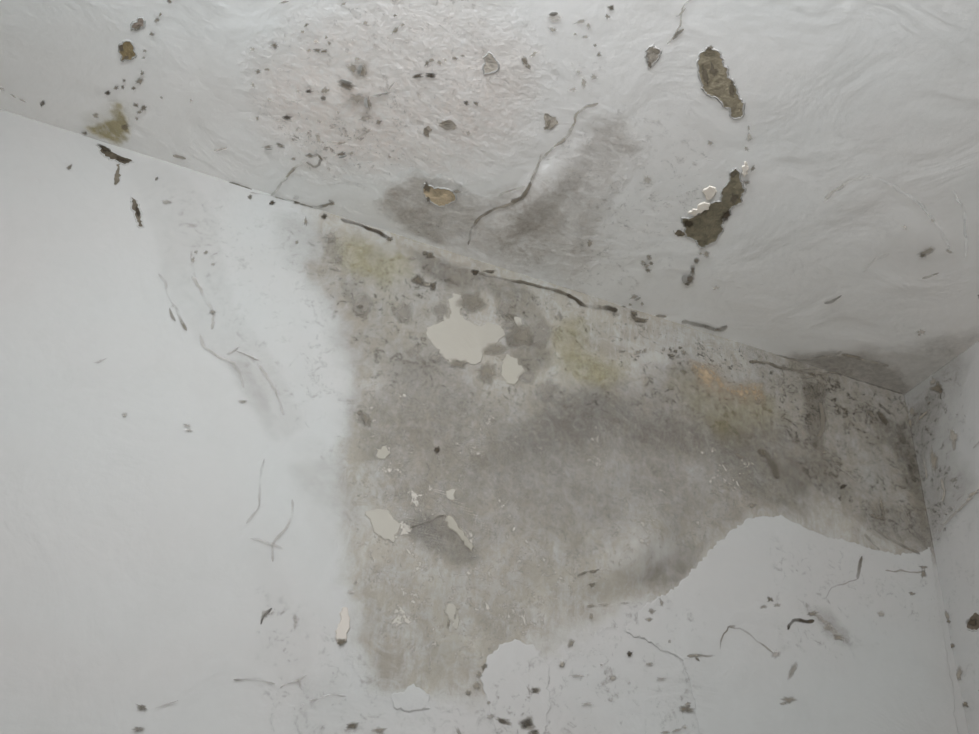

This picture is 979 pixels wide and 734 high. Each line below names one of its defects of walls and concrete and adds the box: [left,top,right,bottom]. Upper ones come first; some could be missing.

flaking render [105,13,162,95]
crack [673,7,686,39]
crack [545,103,598,157]
flaking render [674,45,755,286]
crack [468,181,531,245]
peeling [426,293,505,365]
peeling [501,354,526,385]
water stain [237,0,955,724]